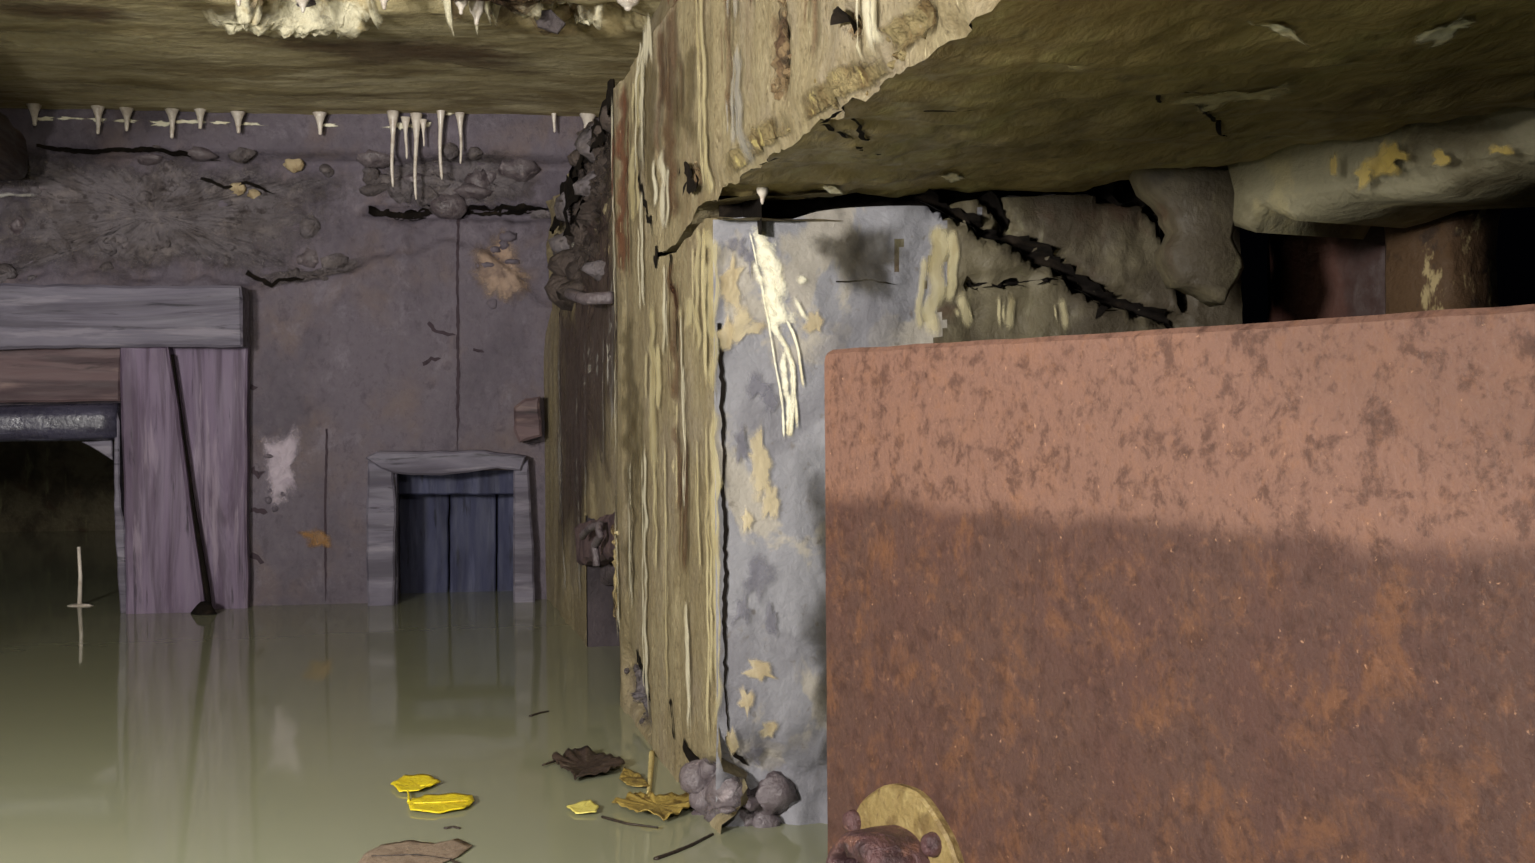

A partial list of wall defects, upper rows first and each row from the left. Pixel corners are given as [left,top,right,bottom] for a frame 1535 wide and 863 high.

water stain [213,0,377,38]
water stain [444,0,454,36]
water stain [475,0,601,36]
water stain [37,116,264,127]
crack [821,110,881,155]
crack [36,144,273,194]
crack [245,270,305,288]
crack [368,78,615,451]
crack [638,175,678,352]
crack [719,158,1183,329]
water stain [557,0,822,728]
peeling [263,434,298,512]